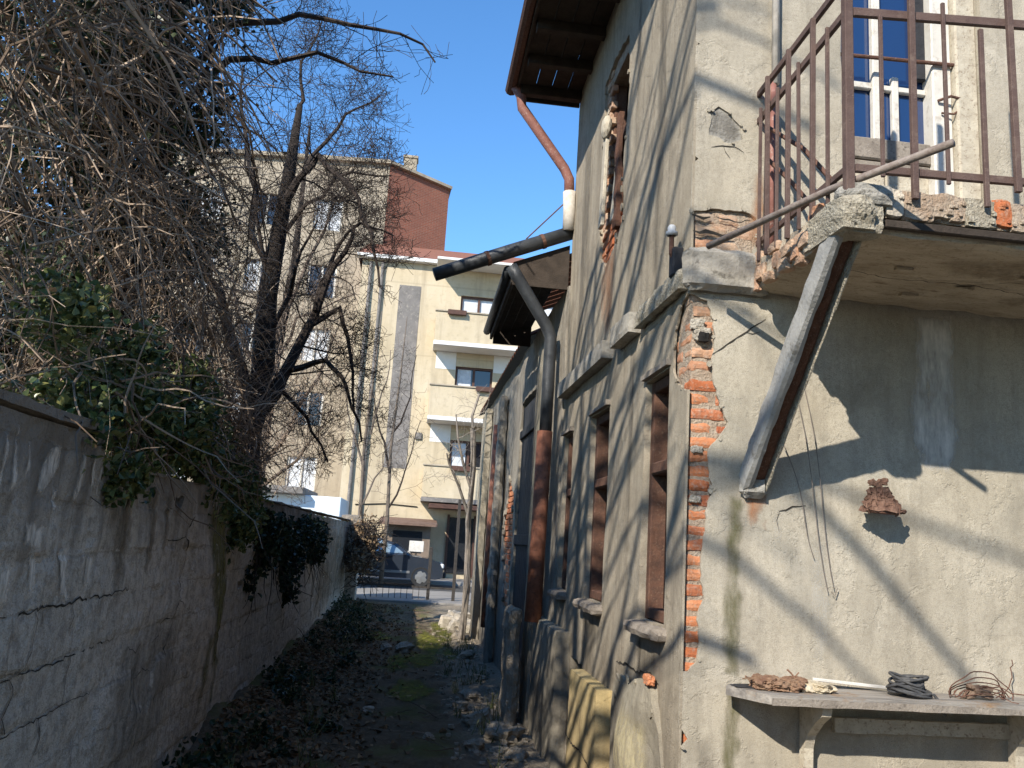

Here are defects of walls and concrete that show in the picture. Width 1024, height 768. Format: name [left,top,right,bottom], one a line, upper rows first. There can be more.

flaking render [599,69,630,263]
spalling [689,182,1024,292]
flaking render [673,295,725,671]
leakage [914,318,958,468]
crack [0,507,196,767]